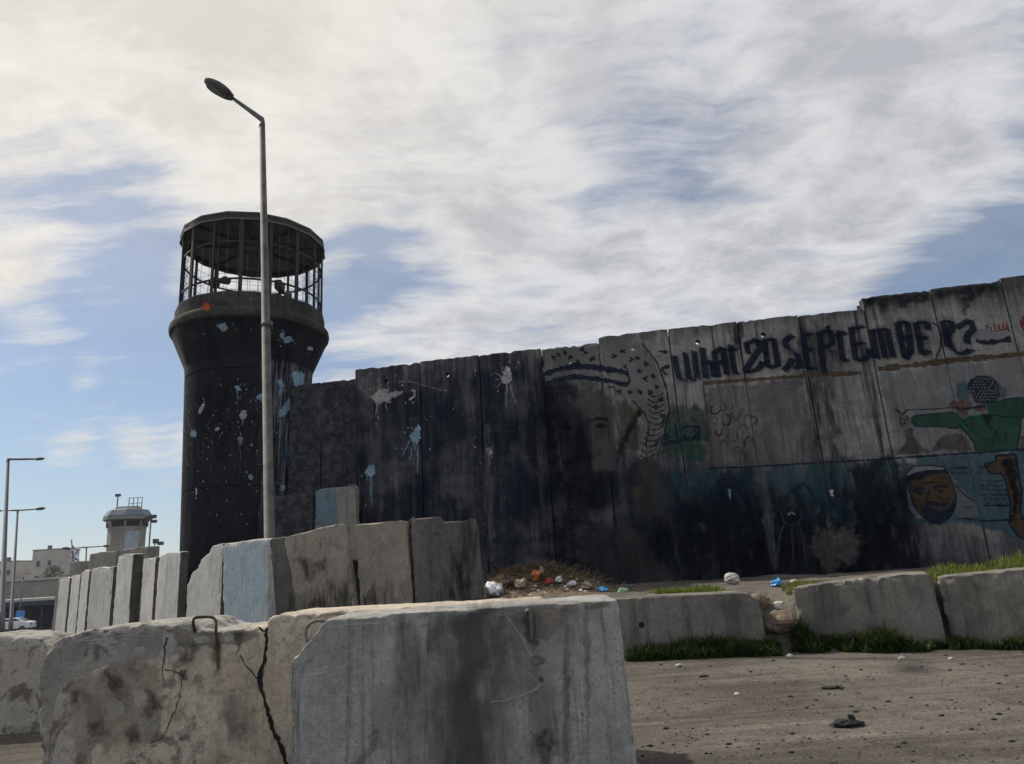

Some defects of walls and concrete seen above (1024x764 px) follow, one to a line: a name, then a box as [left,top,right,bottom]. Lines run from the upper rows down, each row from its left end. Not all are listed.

crack [150,637,186,743]
crack [240,626,289,764]